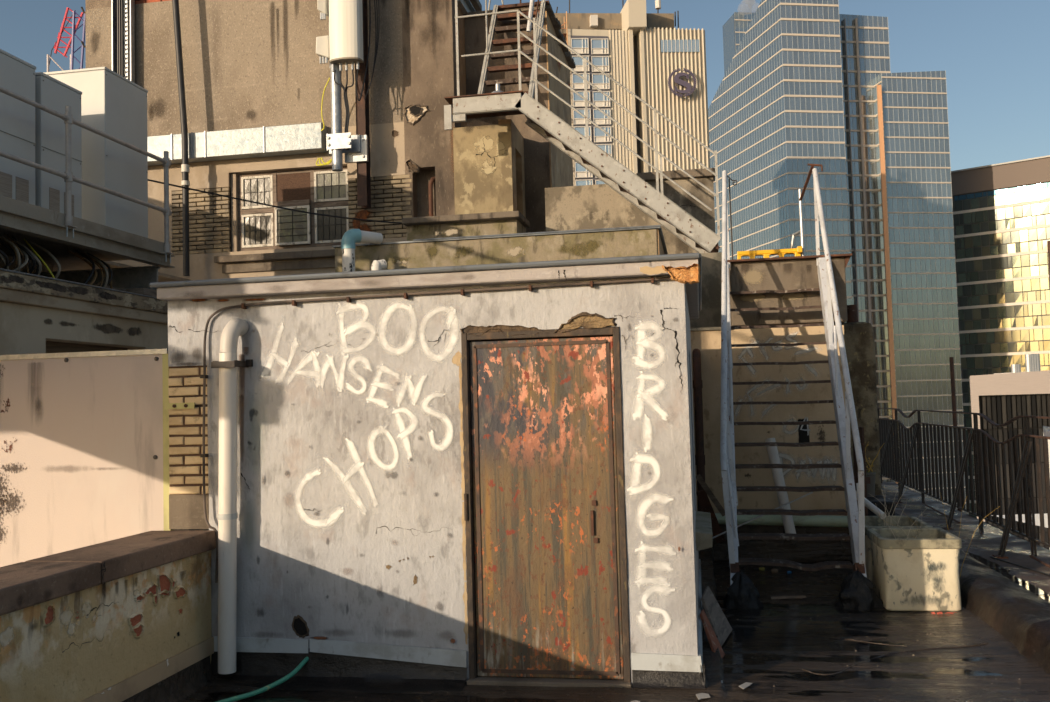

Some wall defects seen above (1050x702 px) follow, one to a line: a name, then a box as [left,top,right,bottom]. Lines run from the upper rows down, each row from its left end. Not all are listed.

spalling [639,263,701,284]
leakage [96,324,141,336]
spalling [460,312,617,337]
crack [614,308,683,392]
mould [0,440,27,541]
spalling [128,573,187,639]
spalling [294,618,307,636]